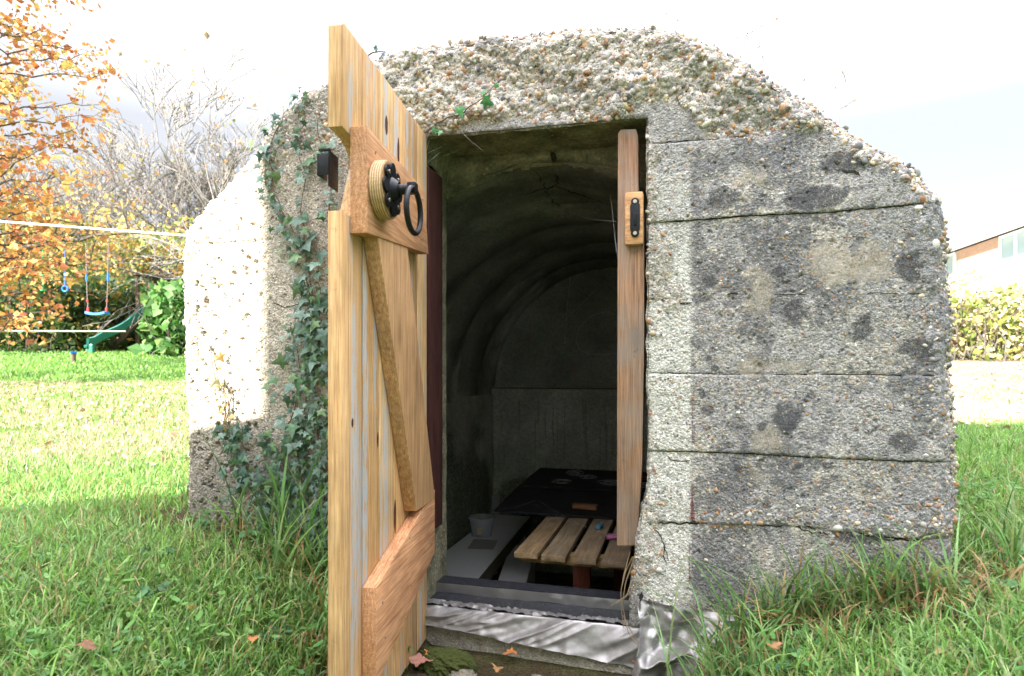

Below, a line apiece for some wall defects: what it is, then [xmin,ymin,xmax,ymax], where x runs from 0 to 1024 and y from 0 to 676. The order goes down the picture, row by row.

leakage [785,151,864,210]
leakage [707,187,736,209]
leakage [895,249,924,281]
leakage [784,299,807,325]
leakage [853,314,872,340]
leakage [896,337,946,359]
leakage [757,402,802,431]
leakage [888,432,918,452]
crack [647,522,701,563]
crack [756,524,920,542]